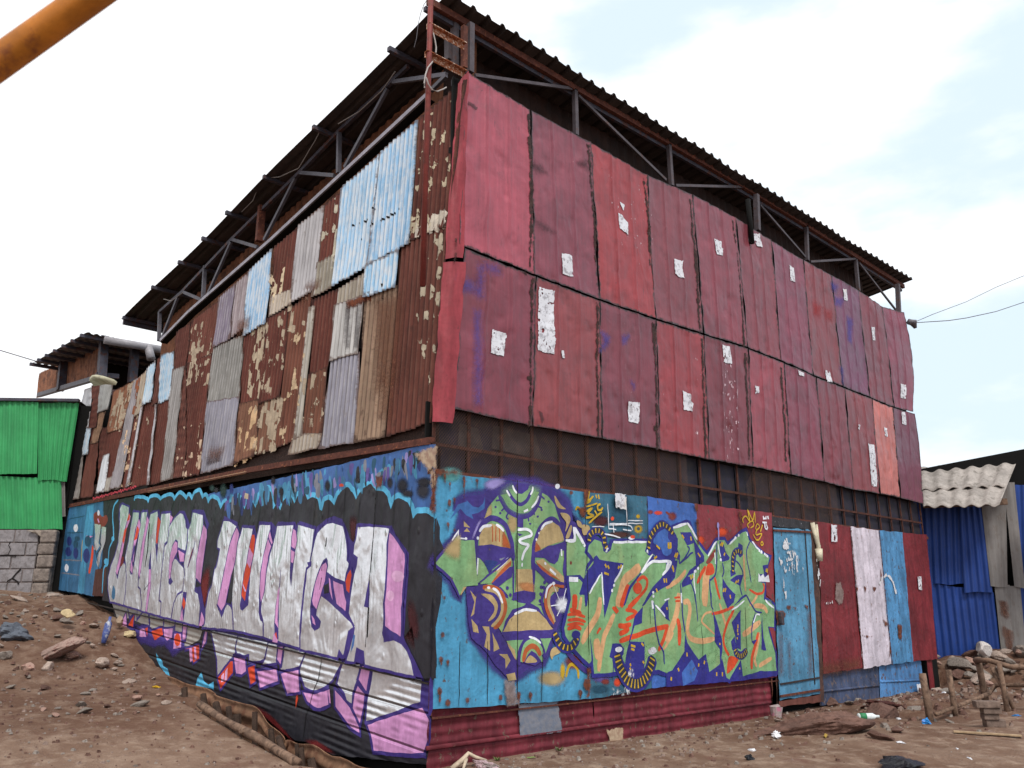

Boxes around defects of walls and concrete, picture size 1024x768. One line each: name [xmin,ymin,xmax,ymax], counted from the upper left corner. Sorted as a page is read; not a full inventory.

peeling [415,112,450,192]
peeling [269,267,285,303]
corrosion [346,292,371,309]
peeling [408,209,448,322]
peeling [234,304,326,467]
corrosion [430,469,478,513]
corrosion [570,489,589,518]